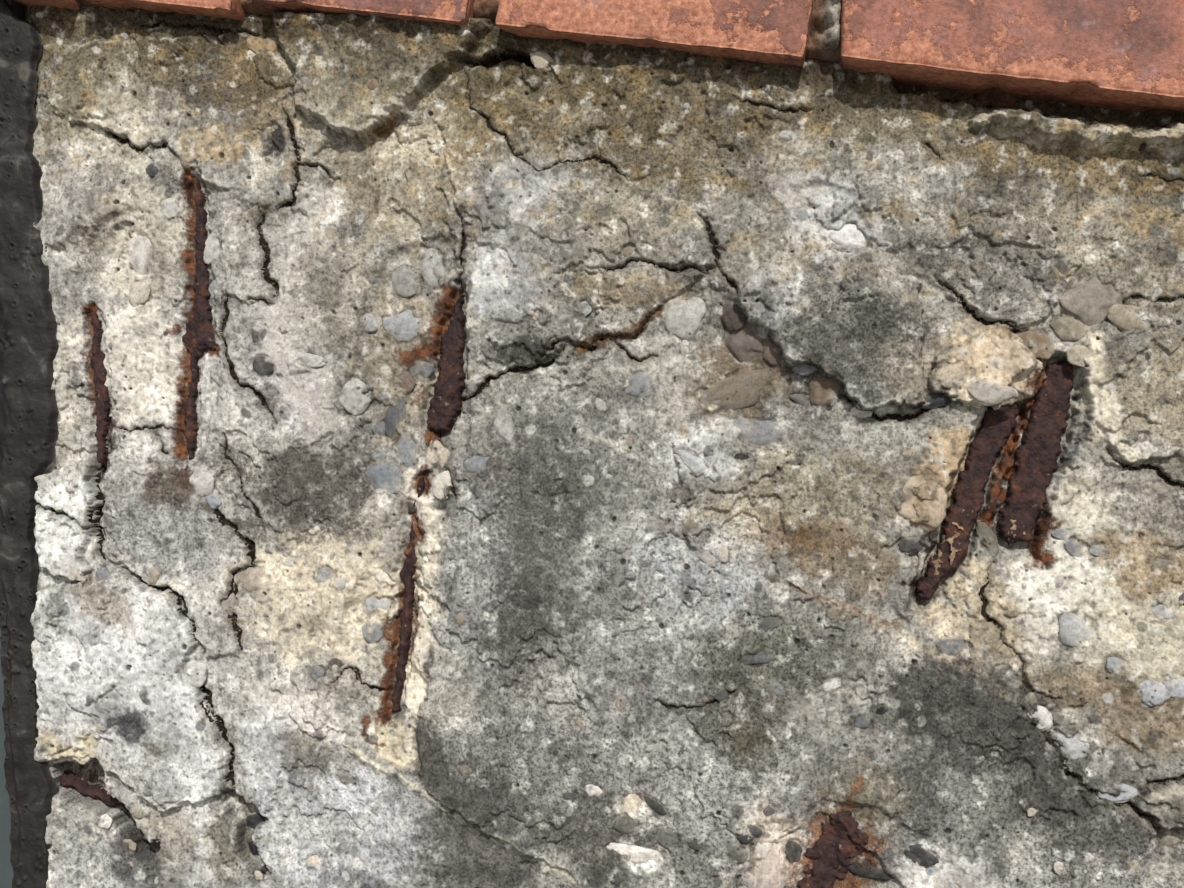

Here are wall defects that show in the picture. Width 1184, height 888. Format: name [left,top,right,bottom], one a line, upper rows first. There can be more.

rust [82,303,112,466]
crack [44,464,202,646]
peeling [30,181,270,884]
rust [164,168,220,483]
crack [199,685,235,788]
crack [213,434,263,650]
crack [219,113,340,424]
spalling [311,235,473,777]
rust [361,465,434,747]
rust [398,279,466,445]
spalling [695,178,1184,854]
rust [910,361,1074,605]